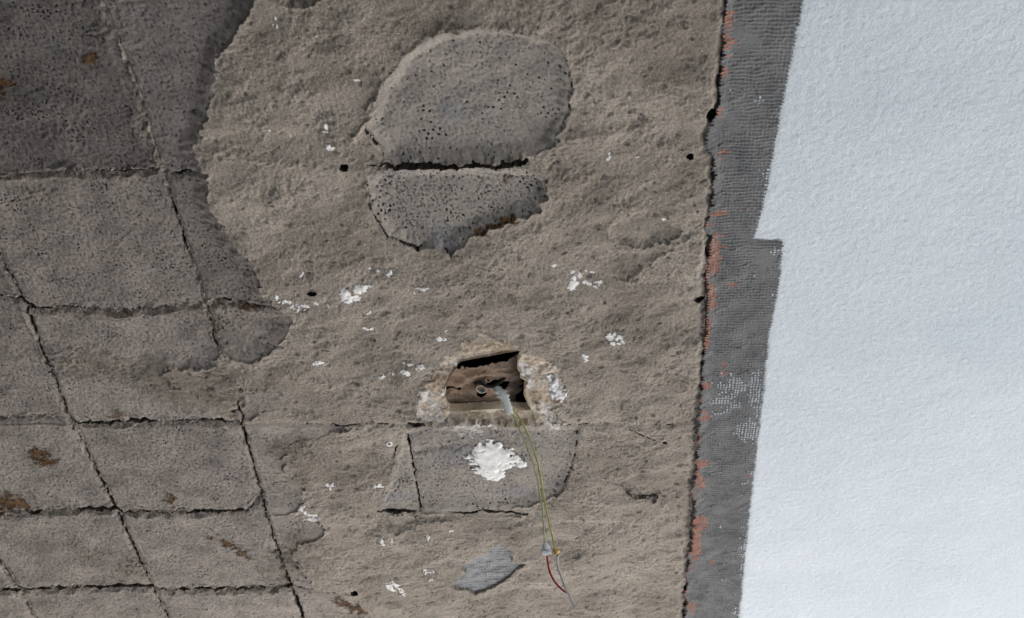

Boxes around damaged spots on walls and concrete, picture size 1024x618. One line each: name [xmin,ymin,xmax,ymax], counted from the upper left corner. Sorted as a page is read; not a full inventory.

crack [364,129,529,172]
crack [171,168,192,253]
spalling [0,0,392,618]
corrosion [28,447,61,466]
crack [0,252,335,618]
spalling [377,333,581,546]
crack [564,423,588,483]
corrosion [0,492,30,515]
crack [455,508,528,516]